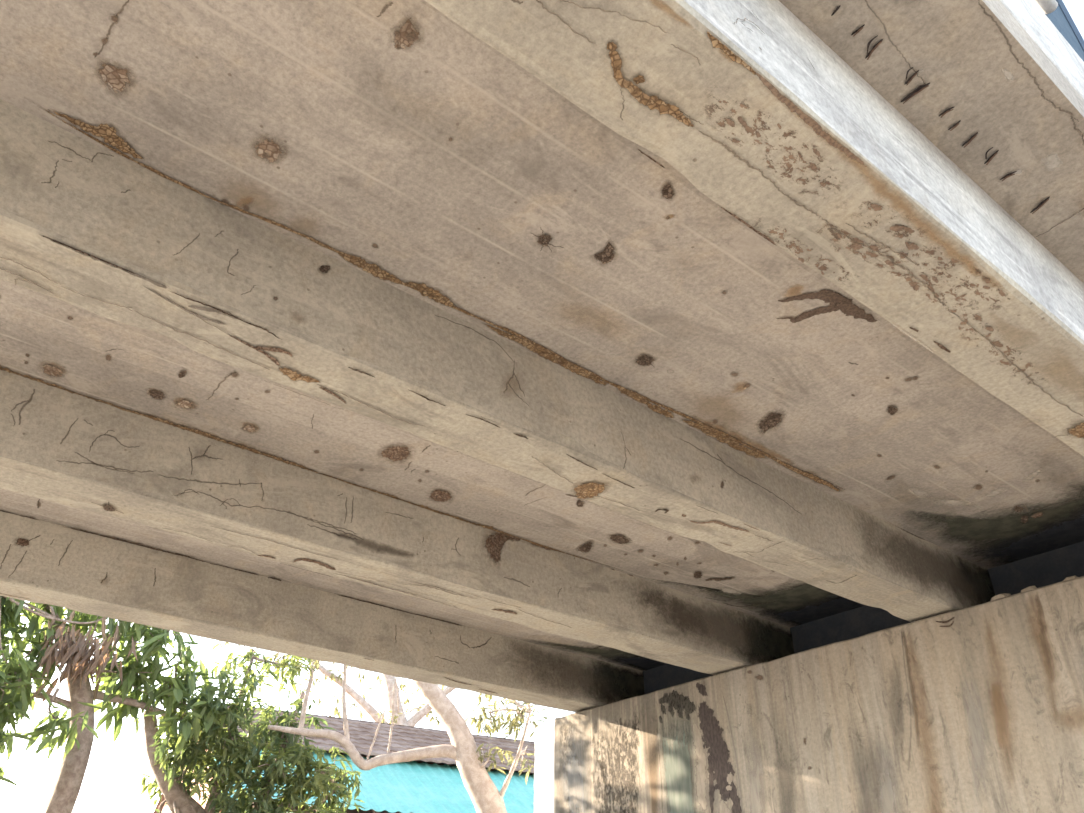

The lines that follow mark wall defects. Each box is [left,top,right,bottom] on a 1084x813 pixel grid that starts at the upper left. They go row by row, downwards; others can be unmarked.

spalling [707,32,867,194]
crack [979,3,1084,144]
spalling [43,235,278,338]
crack [677,109,1084,436]
spalling [721,201,1040,385]
crack [0,257,429,482]
crack [57,418,571,628]
spalling [481,525,559,563]
damp [881,486,1084,604]
damp [524,642,668,701]
damp [647,582,866,661]
damp [560,727,638,813]